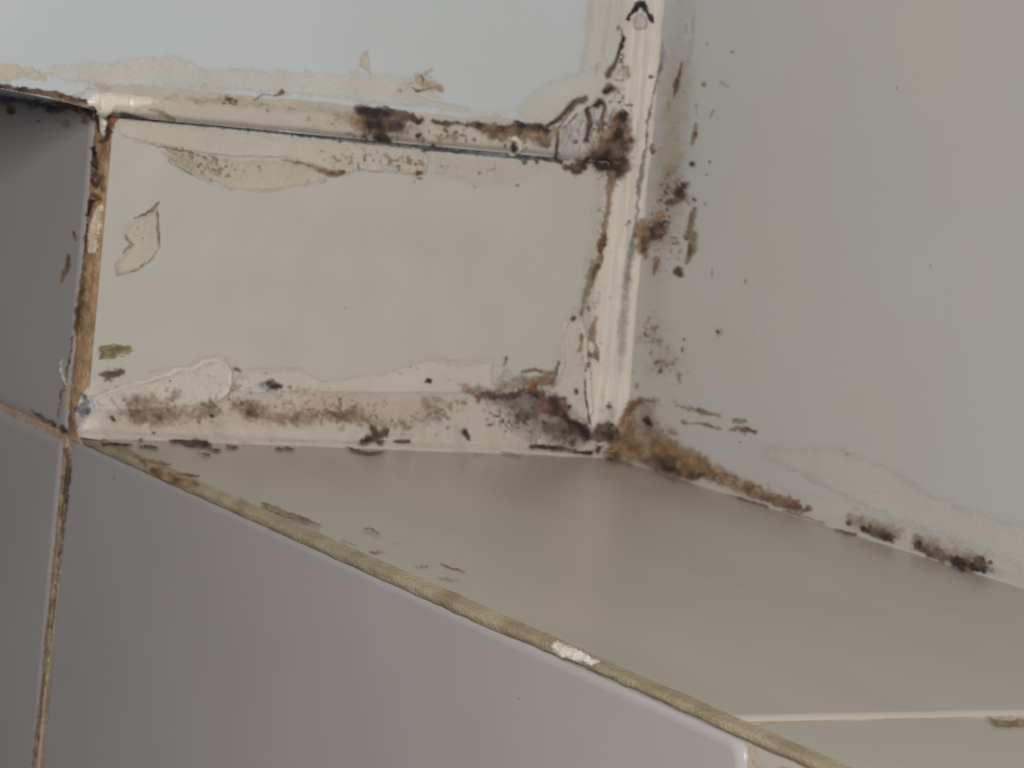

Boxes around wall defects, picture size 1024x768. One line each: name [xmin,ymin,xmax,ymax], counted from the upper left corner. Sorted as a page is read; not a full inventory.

peeling [394,67,466,109]
leakage [148,1,712,387]
peeling [114,209,159,277]
leakage [57,255,450,487]
leakage [464,387,620,456]
leakage [681,408,757,434]
leakage [261,502,320,525]
leakage [733,481,824,523]
leakage [835,514,900,542]
leakage [914,536,992,573]